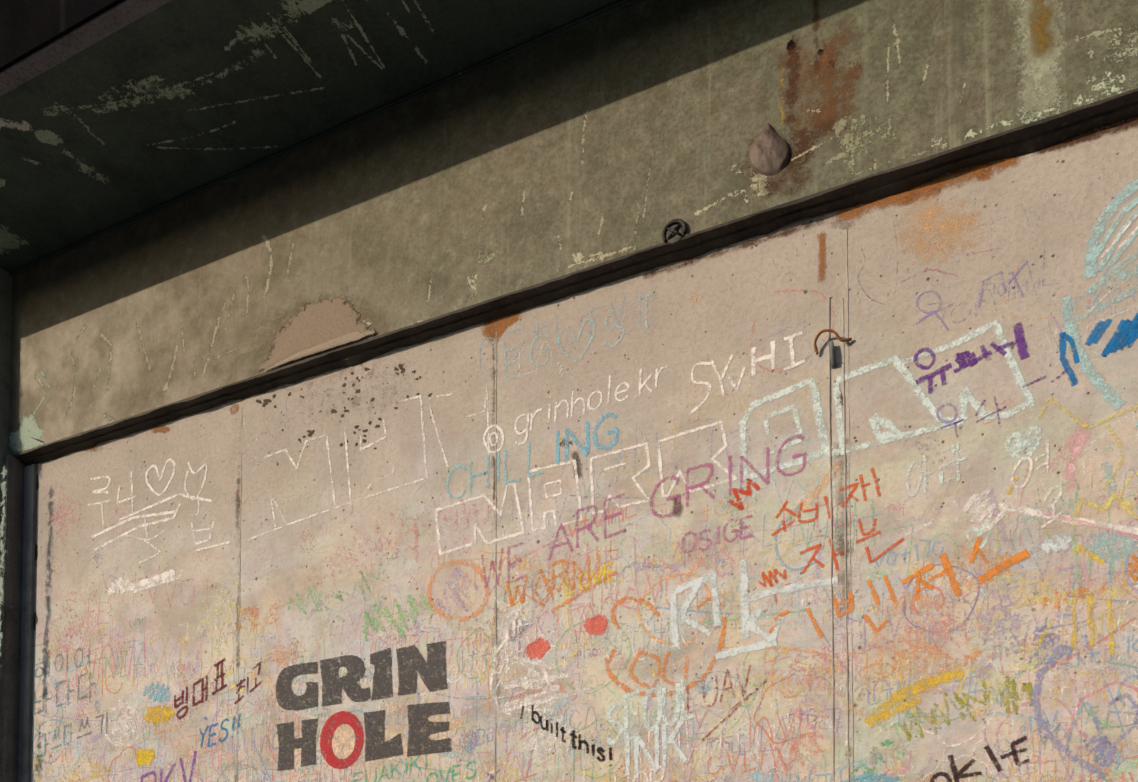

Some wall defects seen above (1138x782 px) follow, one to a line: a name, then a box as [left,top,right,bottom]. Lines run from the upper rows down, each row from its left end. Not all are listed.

corrosion [778,0,858,164]
corrosion [1035,115,1138,154]
corrosion [712,156,1019,280]